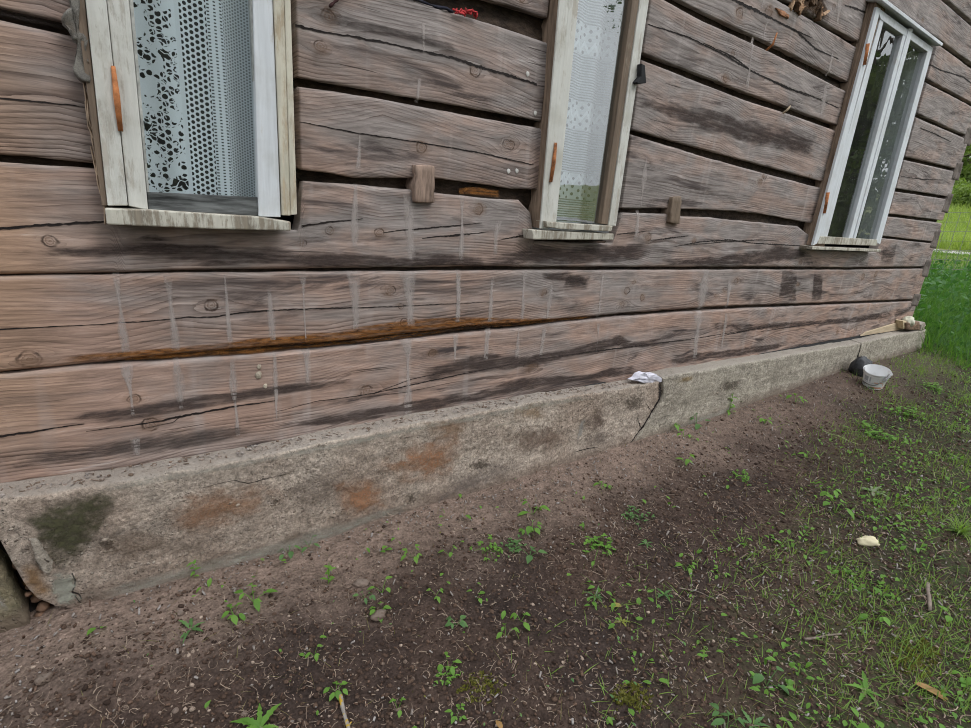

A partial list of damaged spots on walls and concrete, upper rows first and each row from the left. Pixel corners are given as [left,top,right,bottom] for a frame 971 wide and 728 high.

crack [631,383,662,442]